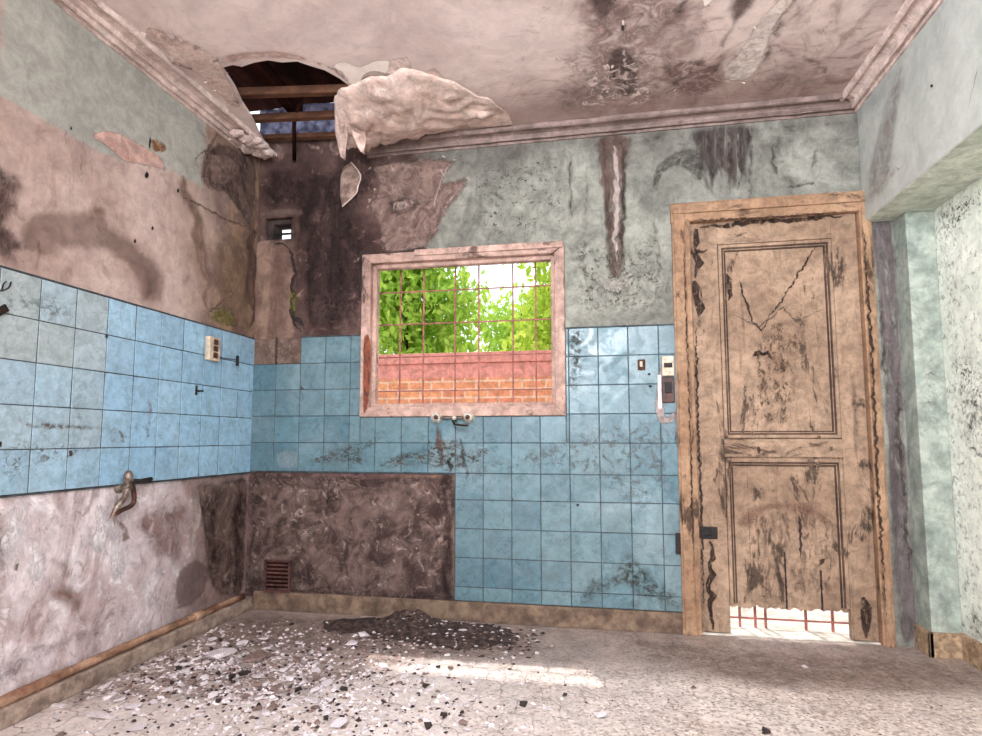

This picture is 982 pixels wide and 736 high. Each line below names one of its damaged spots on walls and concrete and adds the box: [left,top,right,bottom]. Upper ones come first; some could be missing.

damp [733,0,752,19]
damp [555,0,721,110]
peeling [93,130,166,171]
damp [654,126,752,187]
damp [0,172,21,252]
damp [270,171,371,325]
spalling [248,474,455,600]